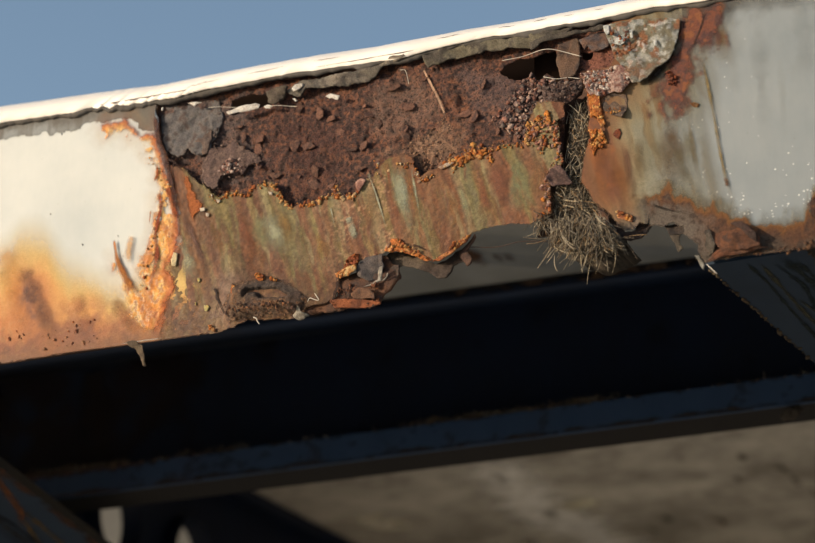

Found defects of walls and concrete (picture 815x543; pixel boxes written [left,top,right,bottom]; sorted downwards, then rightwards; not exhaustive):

peeling [0,104,156,140]
corrosion [0,2,815,364]